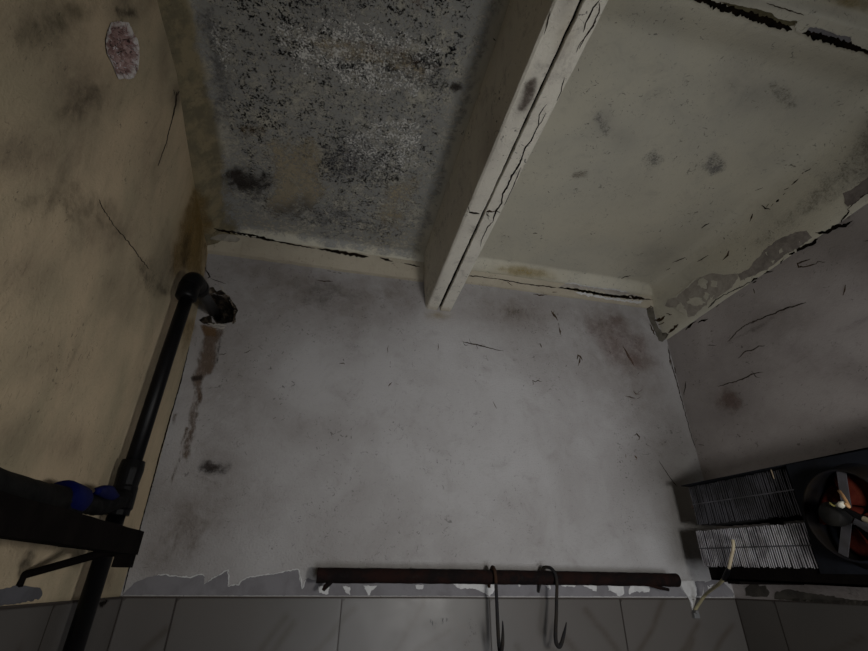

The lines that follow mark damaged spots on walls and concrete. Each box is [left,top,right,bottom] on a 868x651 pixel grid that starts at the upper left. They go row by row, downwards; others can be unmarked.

spalling [105,21,140,80]
crack [694,0,868,55]
crack [158,92,179,165]
leakage [194,0,493,254]
crack [439,0,653,306]
peeling [843,178,868,207]
crack [214,228,419,267]
peeling [560,231,812,342]
crack [686,193,868,330]
crack [712,302,806,387]
peeling [122,569,734,597]
peeling [745,585,868,606]